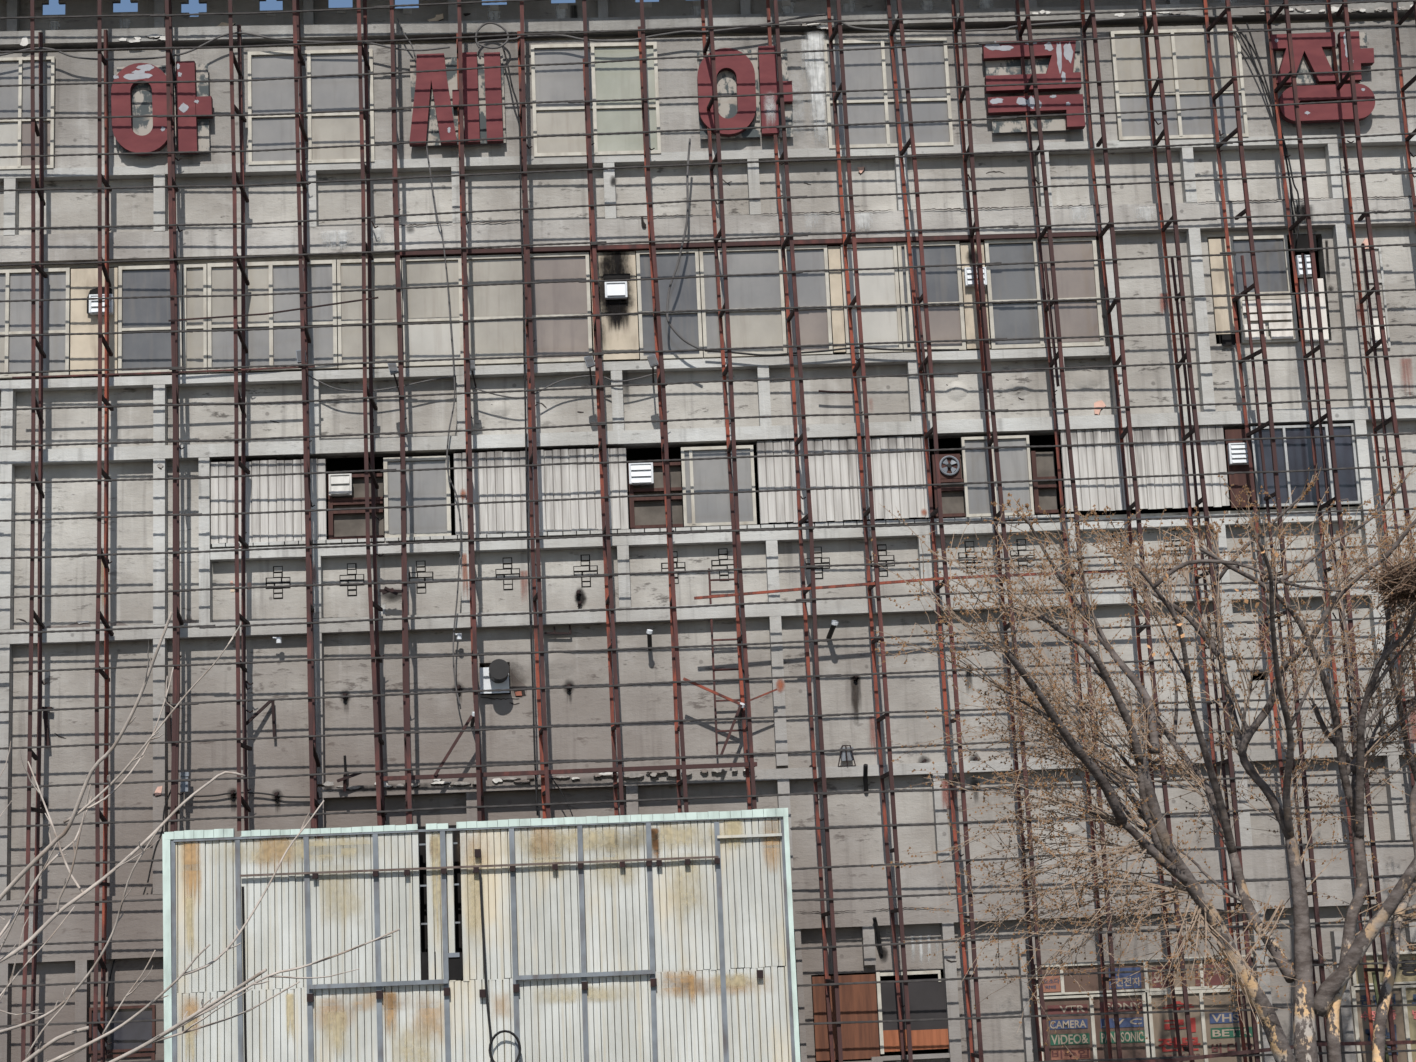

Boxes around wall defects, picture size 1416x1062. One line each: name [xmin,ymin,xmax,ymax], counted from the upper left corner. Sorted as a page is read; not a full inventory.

water stain [608,305,628,328]
rust [255,836,355,860]
rust [185,843,200,944]